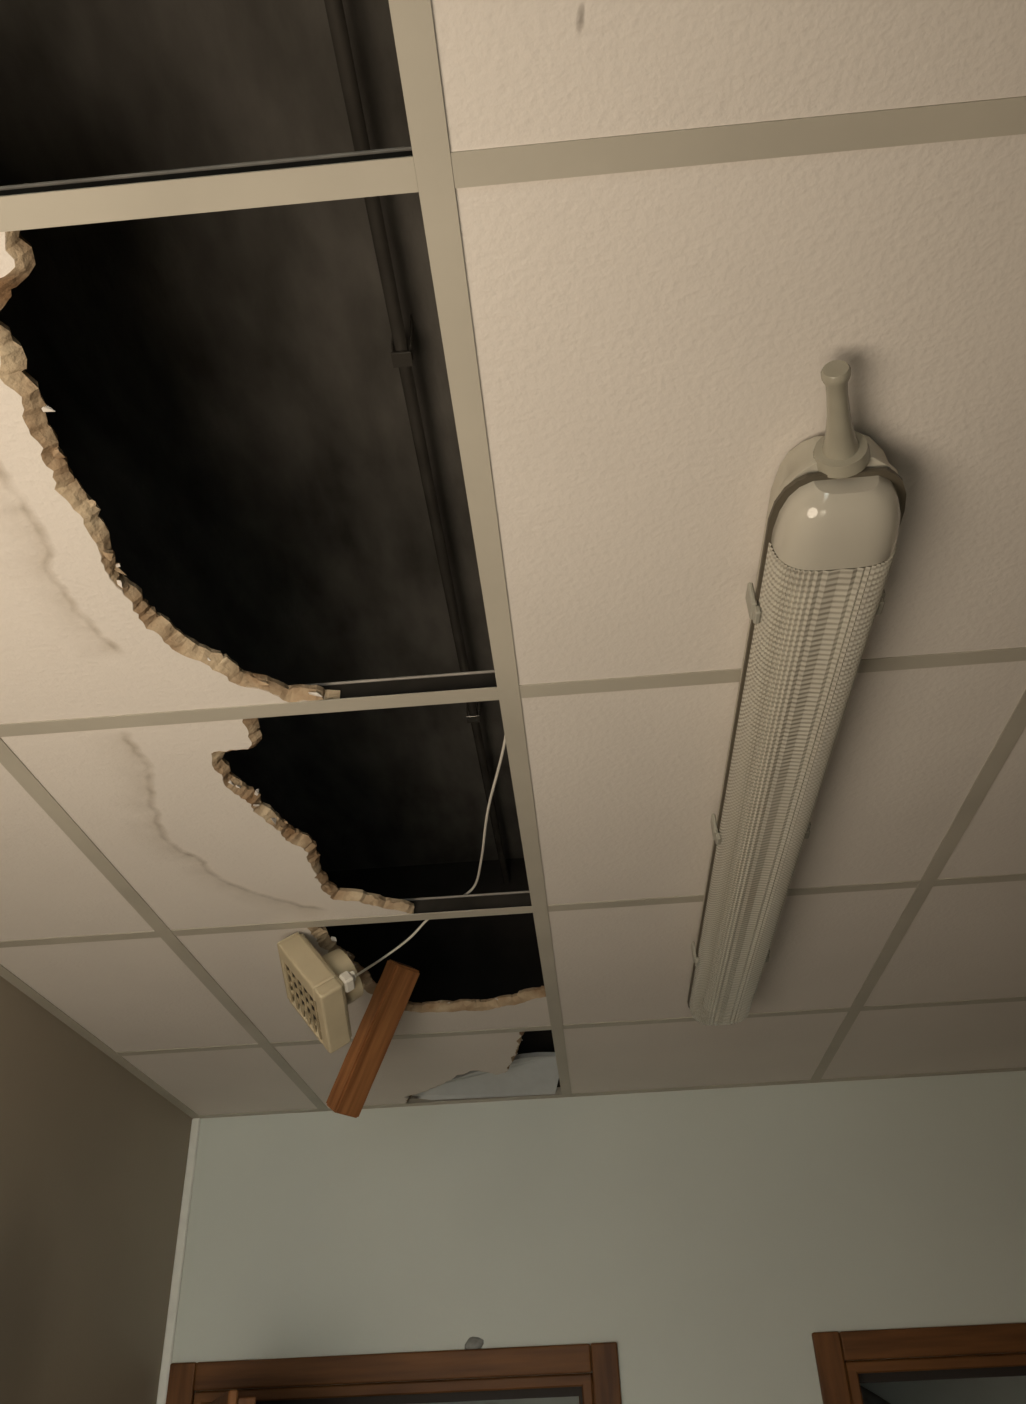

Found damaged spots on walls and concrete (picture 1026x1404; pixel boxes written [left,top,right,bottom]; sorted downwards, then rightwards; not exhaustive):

spalling [0,230,340,702]
spalling [211,718,414,914]
spalling [308,927,377,994]
spalling [404,986,546,1013]